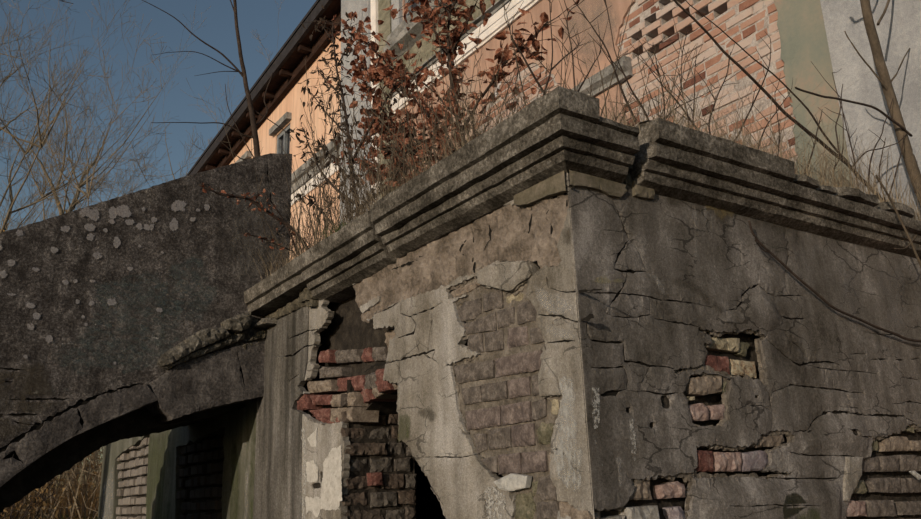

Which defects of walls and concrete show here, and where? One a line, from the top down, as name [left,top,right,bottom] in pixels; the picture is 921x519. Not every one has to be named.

flaking render [617,0,798,168]
crack [459,226,491,273]
crack [528,186,574,234]
crack [542,215,687,397]
crack [729,285,799,320]
crack [0,368,143,461]
spalling [297,330,398,447]
spalling [353,193,793,519]
crack [753,353,921,457]
peeling [305,445,342,517]
crack [765,474,835,482]
spalling [843,424,921,519]